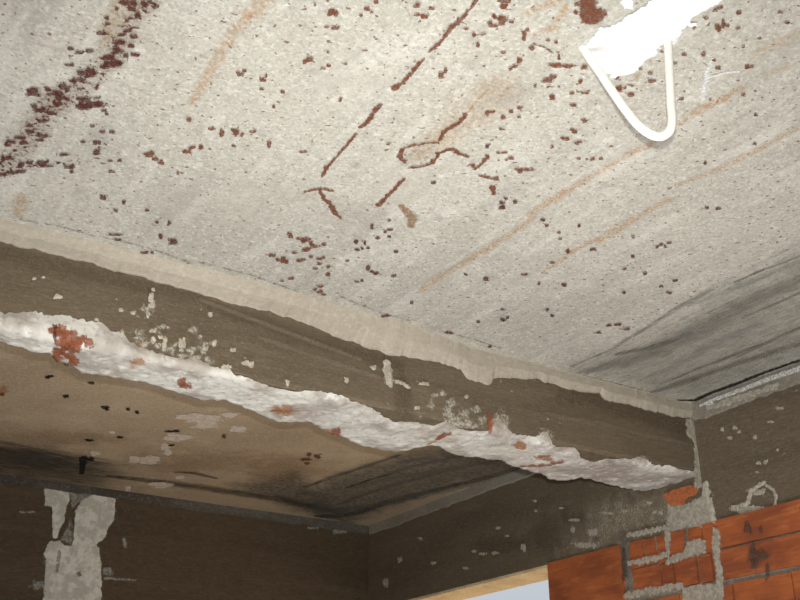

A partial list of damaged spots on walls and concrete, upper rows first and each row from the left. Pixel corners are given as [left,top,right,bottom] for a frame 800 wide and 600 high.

rust [324,8,340,30]
rust [463,0,514,48]
peeling [586,0,722,78]
rust [80,125,115,155]
rust [208,126,257,147]
rust [48,320,95,366]
crack [678,360,800,402]
water stain [558,415,702,489]
water stain [0,442,521,519]
peeling [729,488,766,514]
peeling [33,488,116,600]